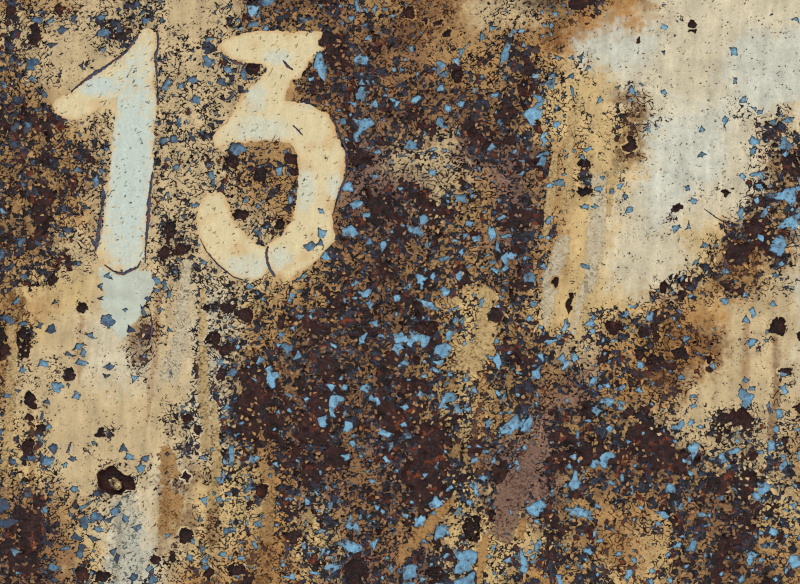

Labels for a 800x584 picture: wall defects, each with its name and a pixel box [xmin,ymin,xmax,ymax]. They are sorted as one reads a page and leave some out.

peeling [89,0,165,54]
rust [0,103,98,253]
peeling [152,55,299,247]
rust [302,30,394,167]
rust [460,42,549,176]
peeling [127,193,200,360]
peeling [119,444,150,479]
spalling [178,463,193,484]
peeling [170,391,213,442]
rust [211,176,514,545]
rust [533,380,701,500]
rust [691,410,779,584]